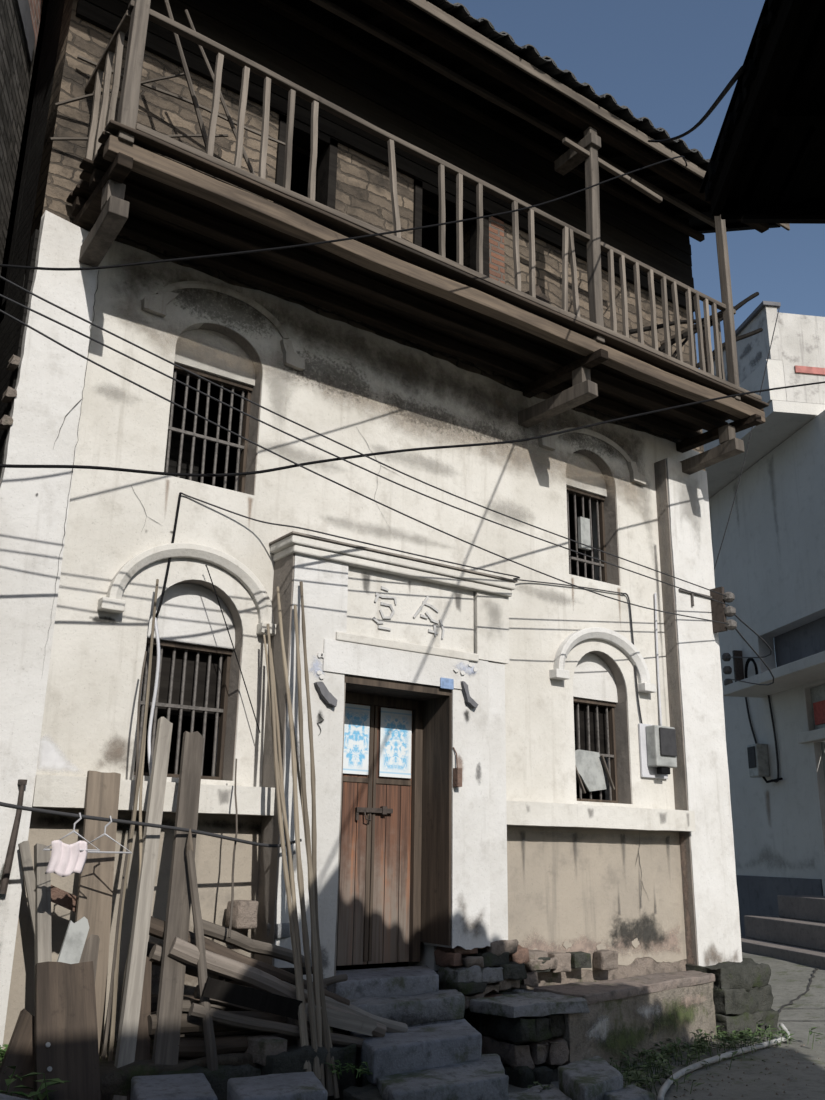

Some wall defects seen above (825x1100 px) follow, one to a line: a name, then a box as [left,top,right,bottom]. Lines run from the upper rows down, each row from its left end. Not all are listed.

water stain [612,901,664,949]